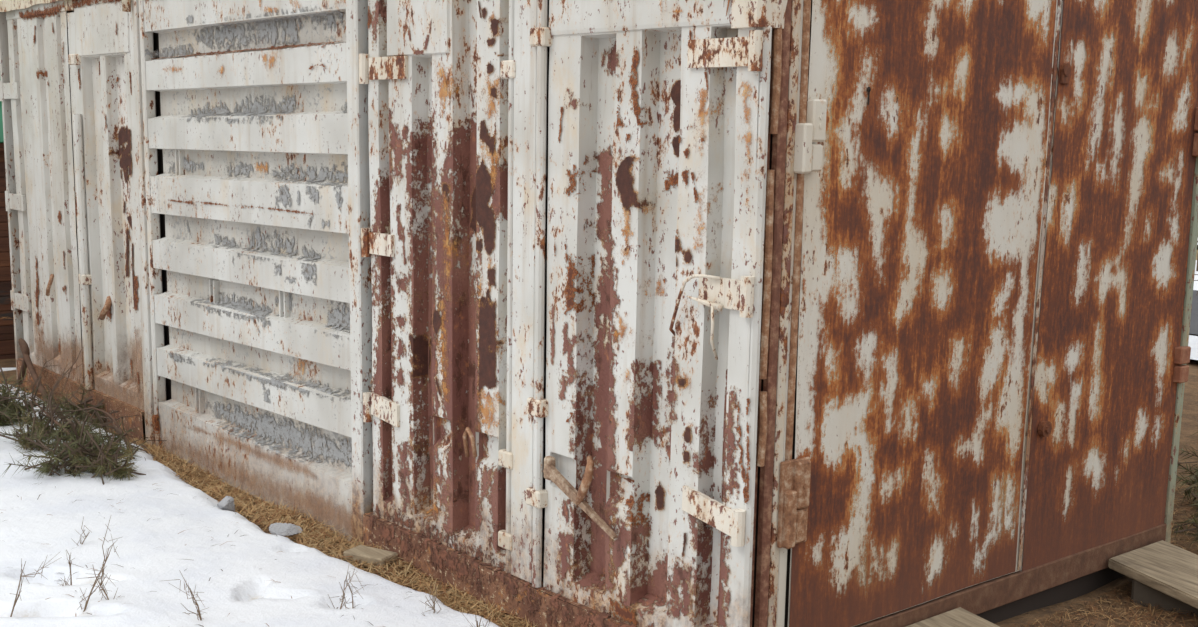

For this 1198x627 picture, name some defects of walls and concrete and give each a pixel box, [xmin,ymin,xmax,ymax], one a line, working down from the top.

peeling [145,4,344,59]
corrosion [105,115,132,183]
peeling [180,93,303,125]
peeling [219,161,348,229]
corrosion [409,1,508,433]
corrosion [615,46,655,265]
corrosion [664,67,736,266]
peeling [191,227,322,333]
peeling [314,301,350,339]
corrosion [554,244,595,315]
corrosion [789,0,1198,627]
peeling [168,351,352,469]